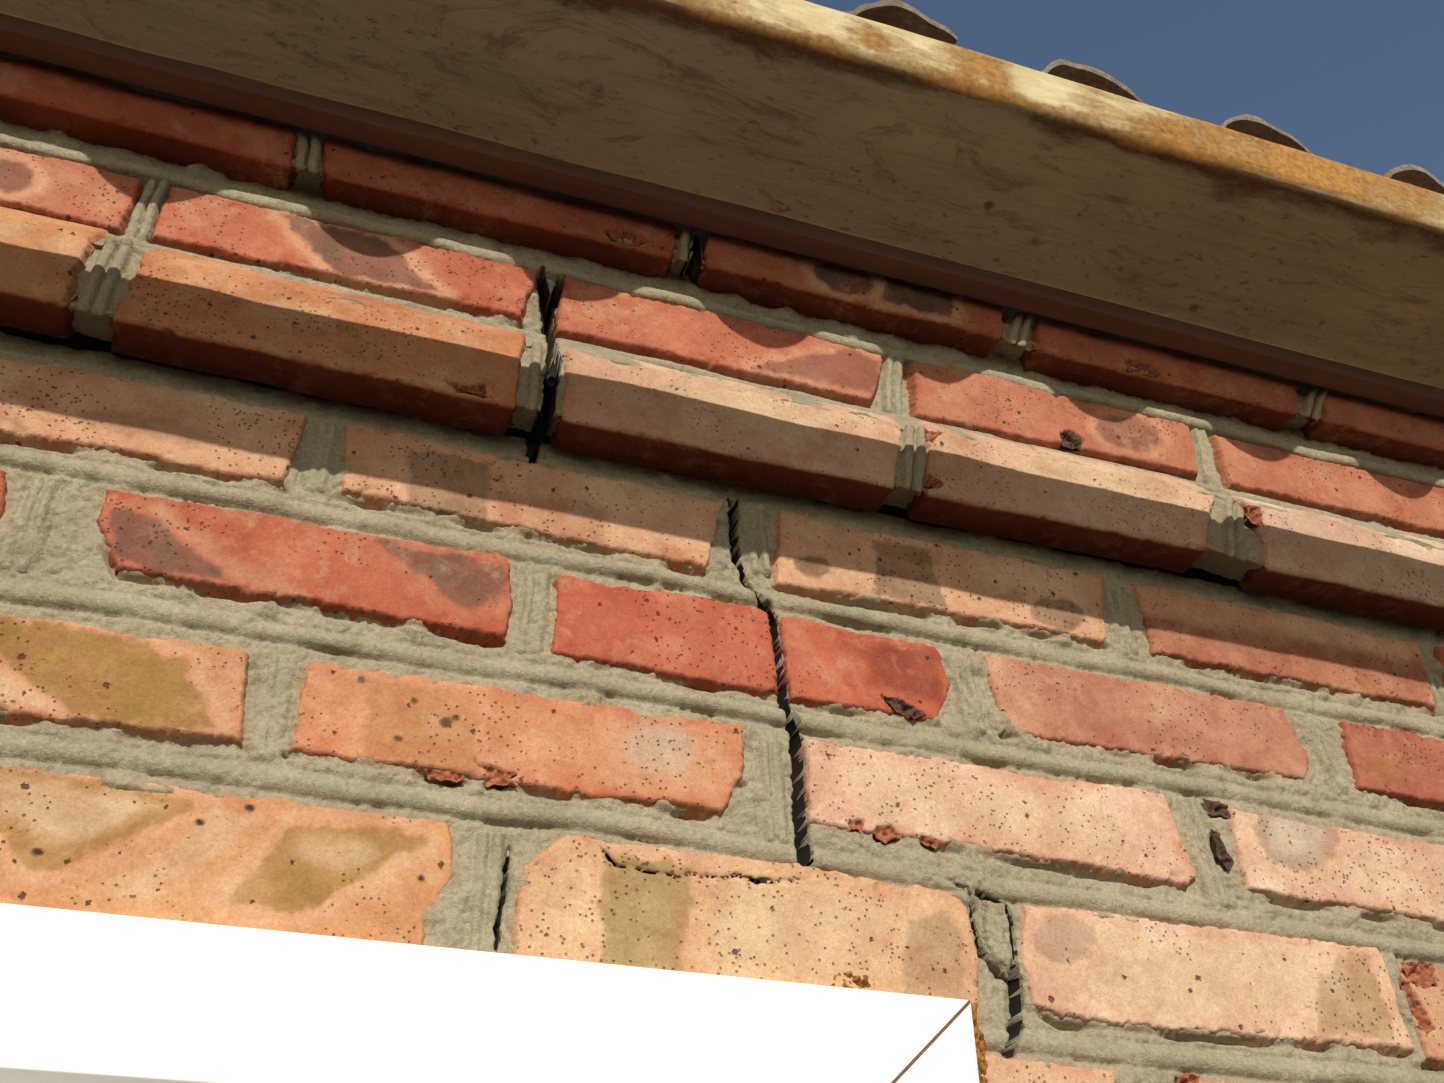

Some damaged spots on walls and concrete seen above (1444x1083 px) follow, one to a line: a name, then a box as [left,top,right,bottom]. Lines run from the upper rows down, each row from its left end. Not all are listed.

crack [526,276,563,464]
crack [602,497,810,884]
spalling [424,768,465,782]
spalling [474,760,518,787]
spalling [848,820,902,844]
spalling [920,835,940,849]
crack [969,895,1021,1059]
spalling [1399,961,1437,1034]
spalling [1175,1072,1201,1083]